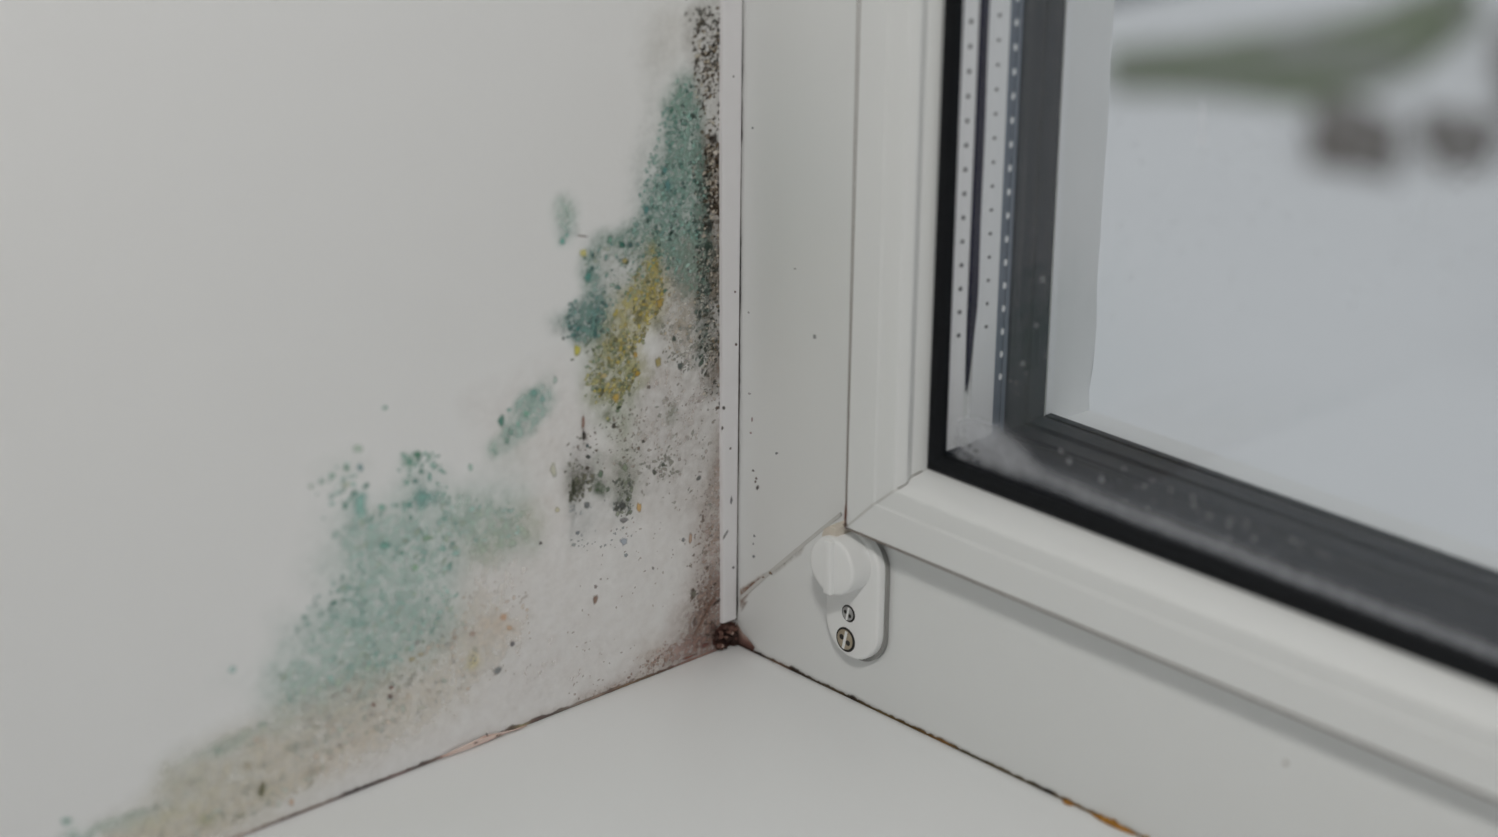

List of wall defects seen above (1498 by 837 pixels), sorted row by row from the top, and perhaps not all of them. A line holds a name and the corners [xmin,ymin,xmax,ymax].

leakage [493,377,557,453]
leakage [551,6,737,699]
leakage [88,445,542,837]